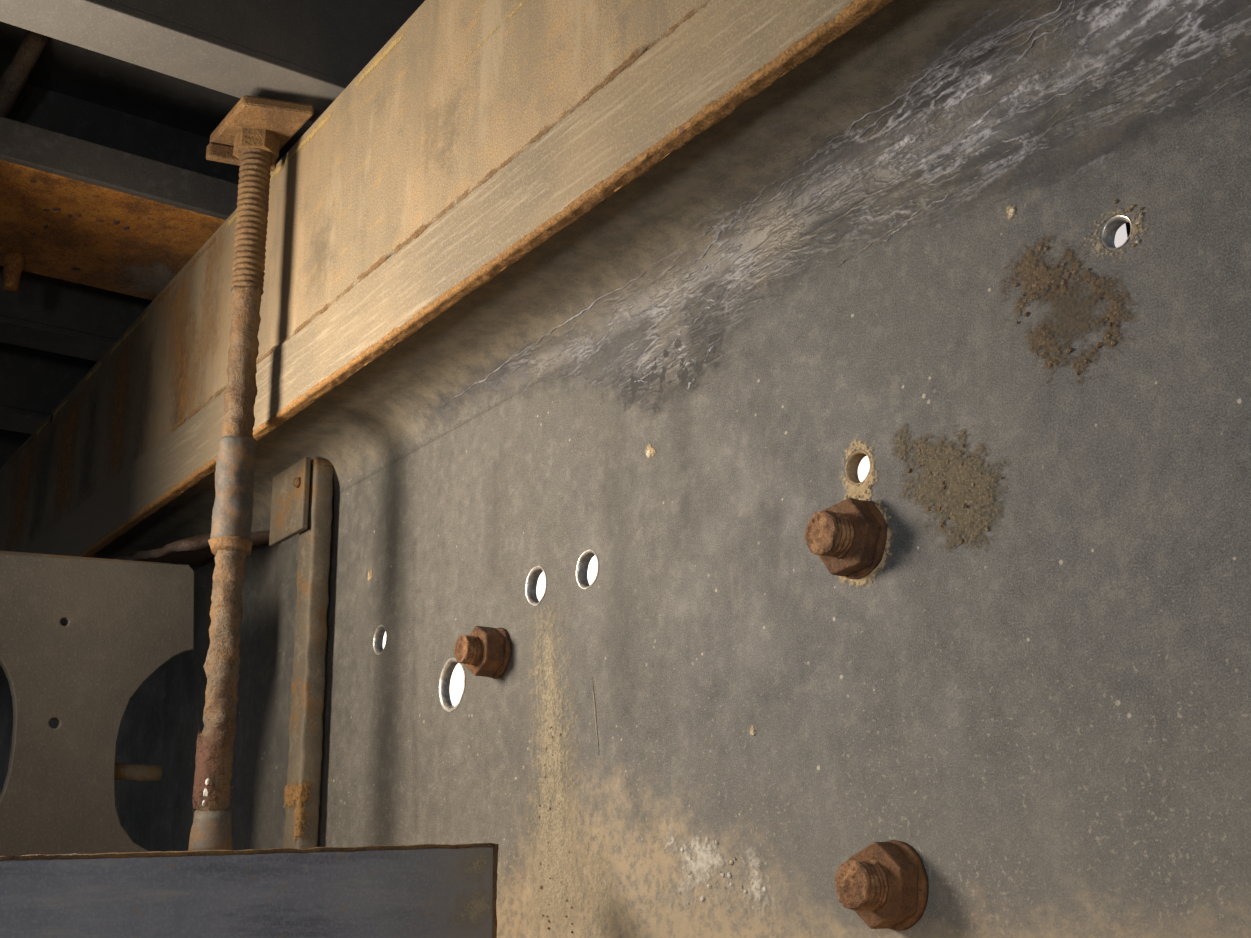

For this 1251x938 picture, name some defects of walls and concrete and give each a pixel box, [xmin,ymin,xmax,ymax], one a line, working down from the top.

corrosion [253,0,893,441]
corrosion [999,200,1147,383]
corrosion [78,456,217,557]
corrosion [891,424,1007,551]
water stain [661,836,767,905]